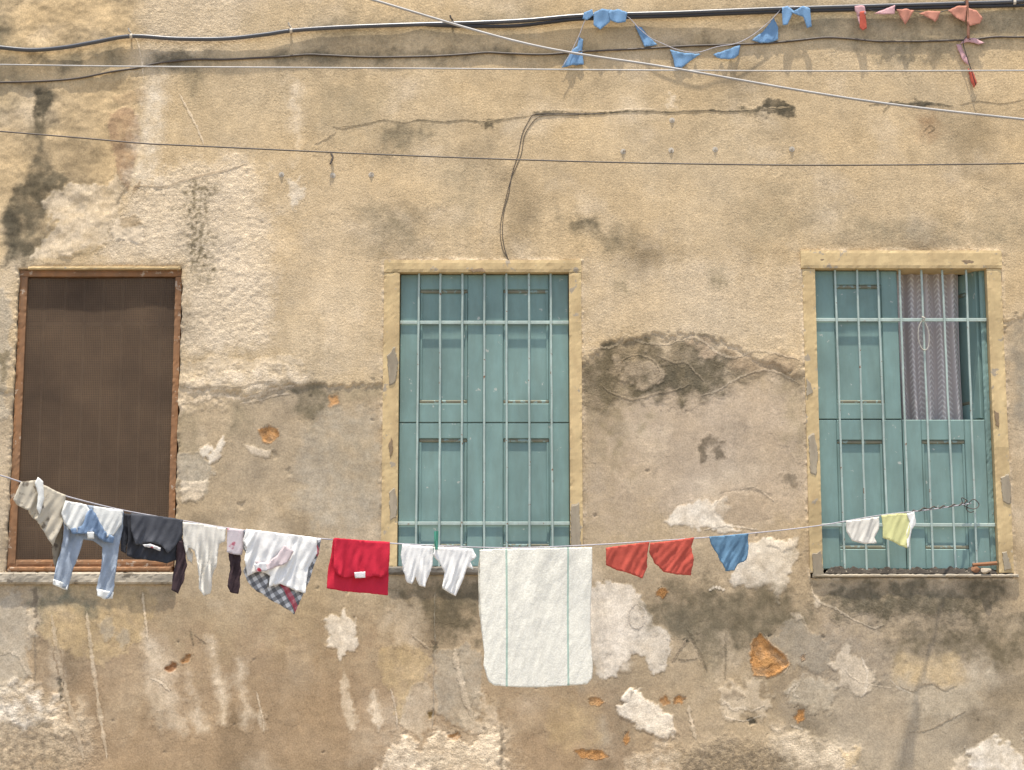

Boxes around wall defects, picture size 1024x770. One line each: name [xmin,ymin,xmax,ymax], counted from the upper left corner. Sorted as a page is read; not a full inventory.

damp [0,0,216,269]
crack [315,107,790,144]
flaking render [177,434,227,504]
spalling [242,423,281,459]
damp [582,323,807,493]
peeling [765,536,785,553]
spalling [576,686,688,770]
flaking render [713,614,1024,770]